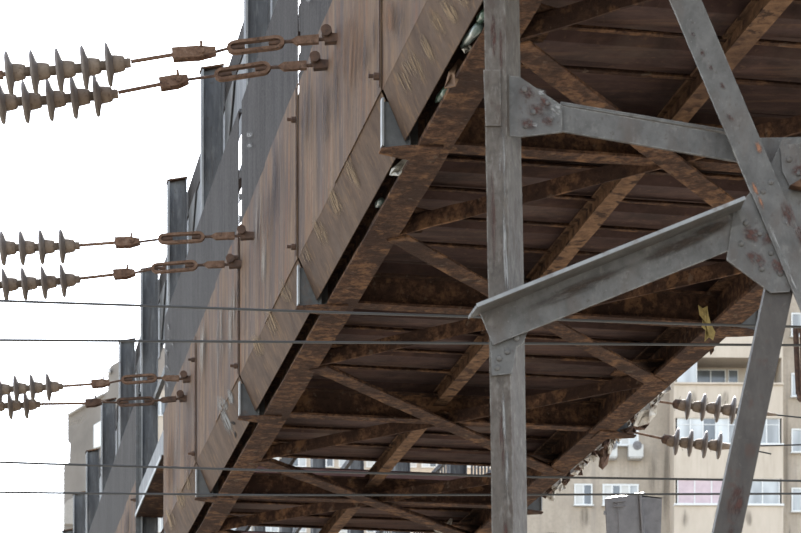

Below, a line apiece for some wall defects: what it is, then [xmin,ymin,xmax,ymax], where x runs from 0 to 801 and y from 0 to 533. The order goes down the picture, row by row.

peeling [542,385,672,502]